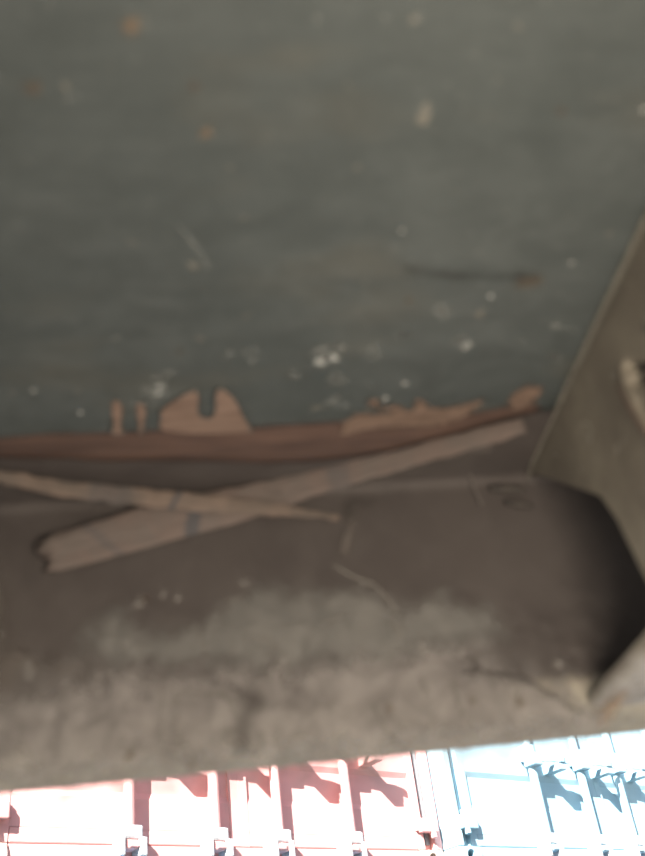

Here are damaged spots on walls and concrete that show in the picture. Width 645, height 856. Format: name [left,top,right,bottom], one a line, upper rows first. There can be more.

peeling [0,386,541,464]